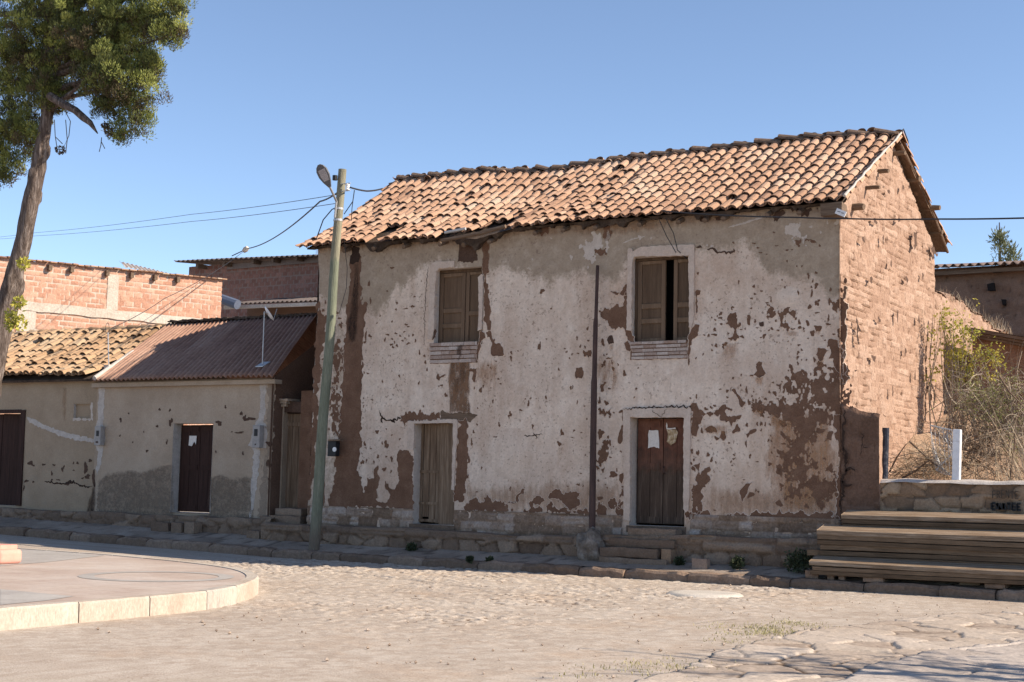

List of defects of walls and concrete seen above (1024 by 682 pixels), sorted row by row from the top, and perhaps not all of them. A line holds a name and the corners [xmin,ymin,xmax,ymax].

crack [44,480,91,488]
peeling [306,246,448,509]
crack [379,410,402,423]
peeling [458,242,519,393]
peeling [453,382,624,516]
peeling [564,283,639,420]
peeling [684,208,857,524]